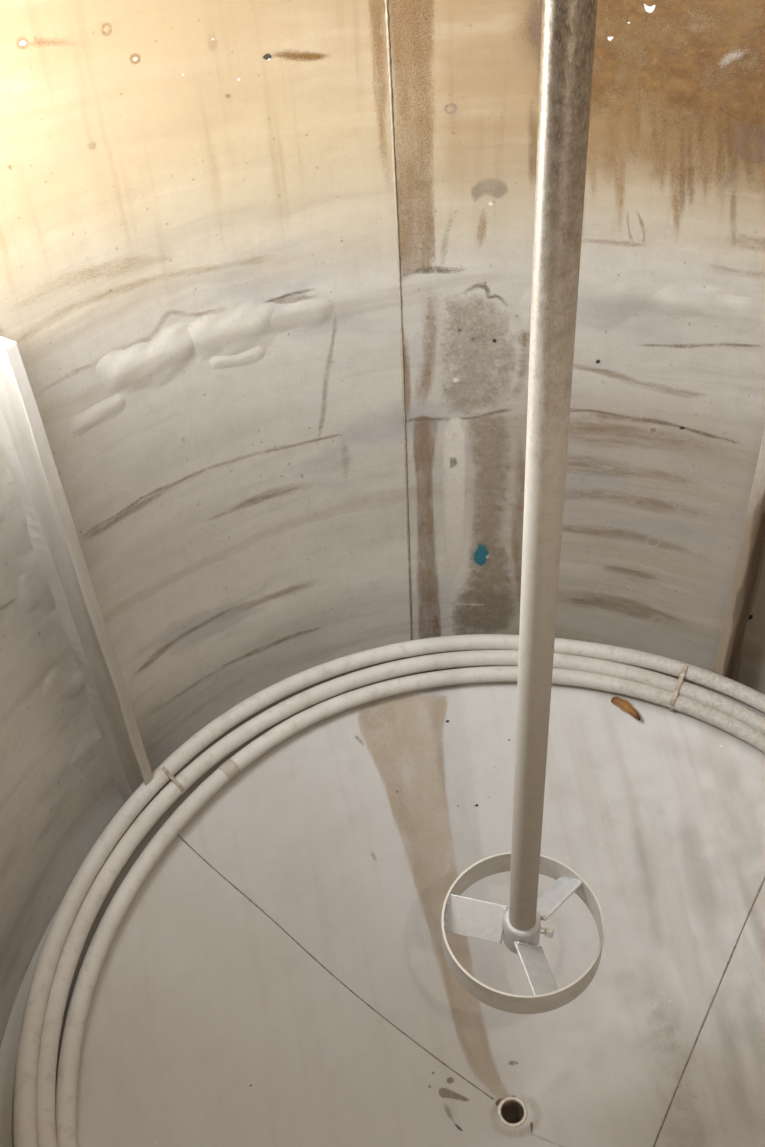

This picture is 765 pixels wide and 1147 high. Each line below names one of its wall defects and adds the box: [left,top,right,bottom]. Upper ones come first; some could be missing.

leakage [368,0,463,280]
leakage [471,179,509,248]
corrosion [501,0,542,188]
corrosion [582,0,765,244]
leakage [400,287,526,639]